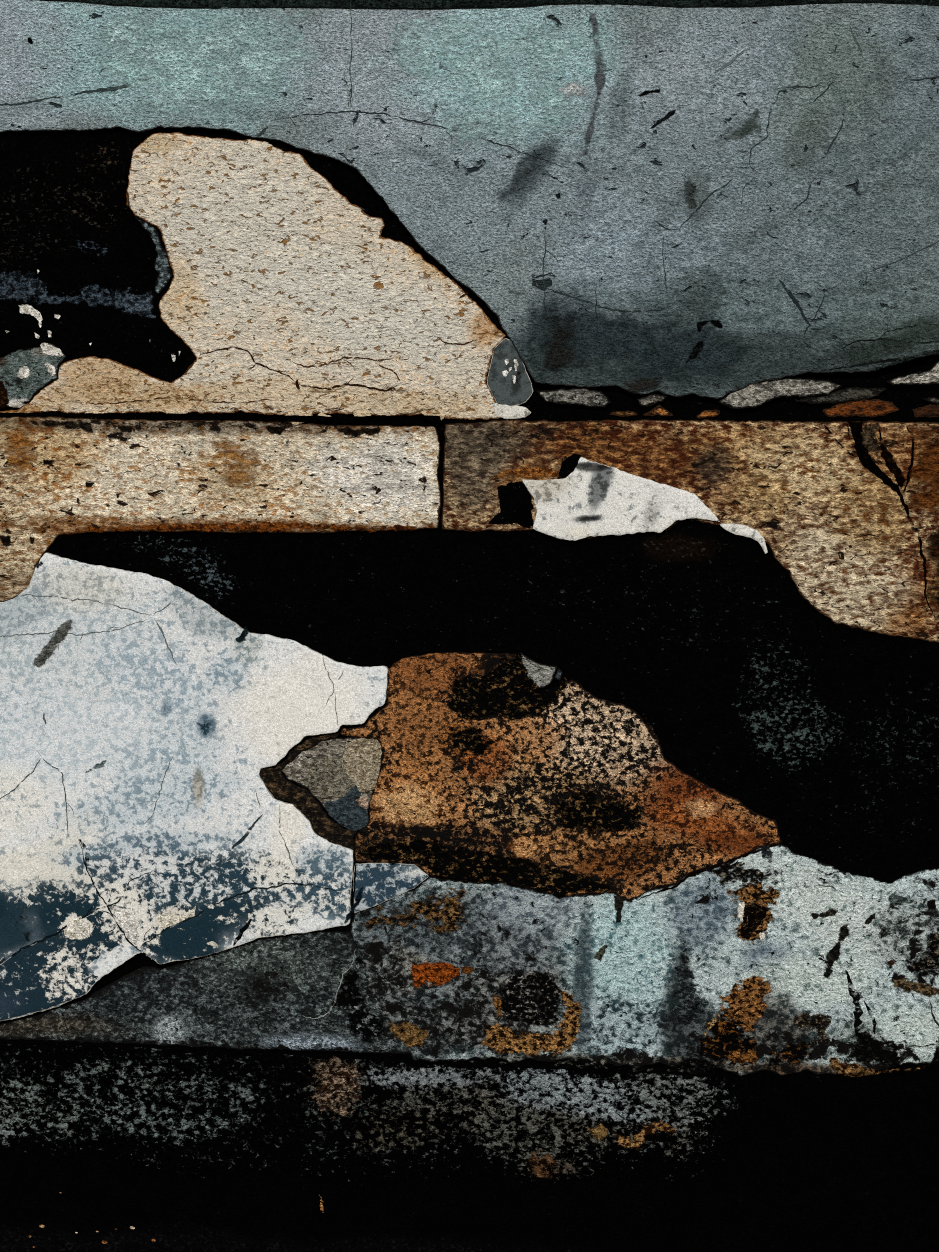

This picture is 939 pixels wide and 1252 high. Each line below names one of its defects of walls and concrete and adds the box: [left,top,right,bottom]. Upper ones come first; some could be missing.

spalling [0,132,673,425]
crack [71,346,402,413]
flaking render [697,361,939,419]
corrosion [67,521,433,535]
peeling [522,457,768,554]
crack [824,424,935,617]
flaking render [0,553,783,1021]
crack [0,752,356,1019]
corrosion [361,887,470,937]
crack [637,843,780,901]
corrosion [706,861,780,945]
corrosion [481,970,582,1056]